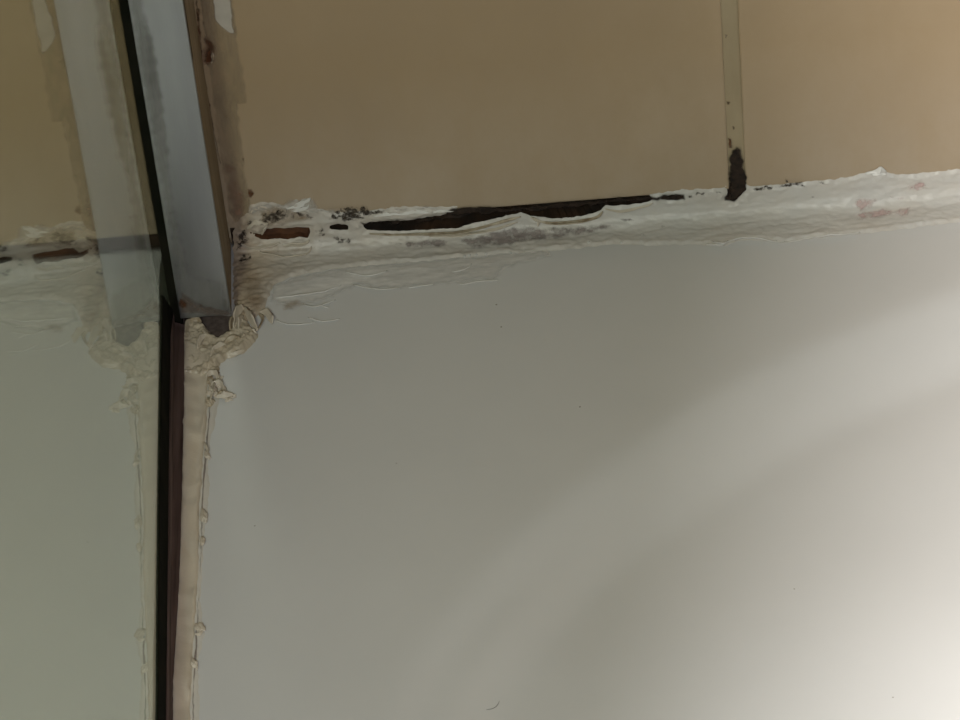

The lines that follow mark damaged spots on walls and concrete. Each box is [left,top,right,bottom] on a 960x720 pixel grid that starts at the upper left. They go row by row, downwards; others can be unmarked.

leakage [725,148,803,202]
peeling [865,166,887,176]
peeling [286,198,311,212]
peeling [374,209,453,217]